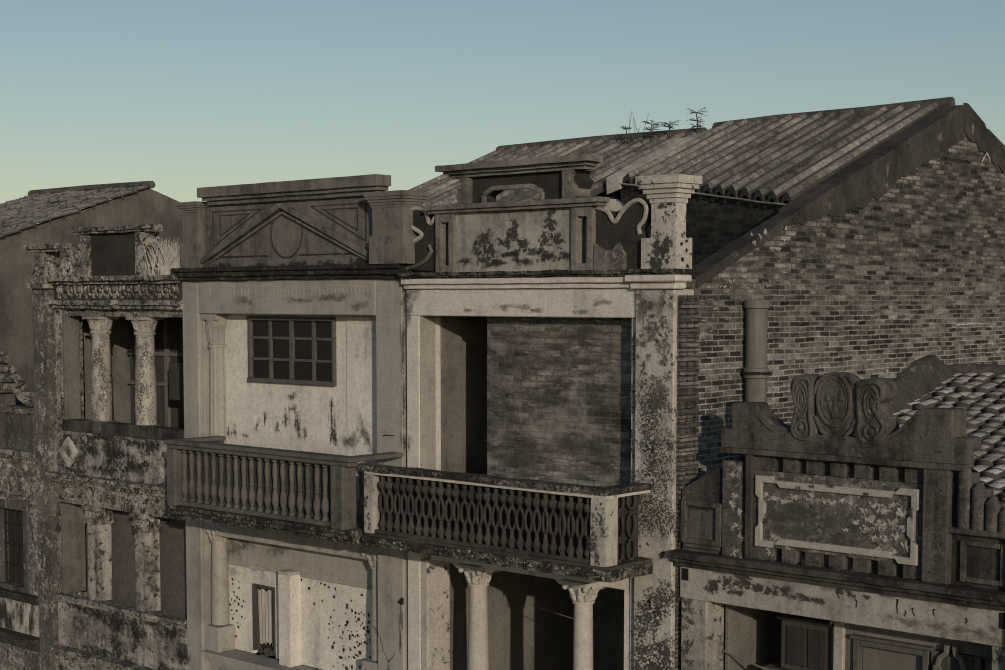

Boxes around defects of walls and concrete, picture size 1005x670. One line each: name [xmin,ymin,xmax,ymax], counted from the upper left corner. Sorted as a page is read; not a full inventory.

flaking render [471,208,565,265]
flaking render [646,231,689,273]
damp [227,393,307,438]
peeling [763,484,918,555]
peeling [228,564,276,637]
spalling [297,568,371,670]